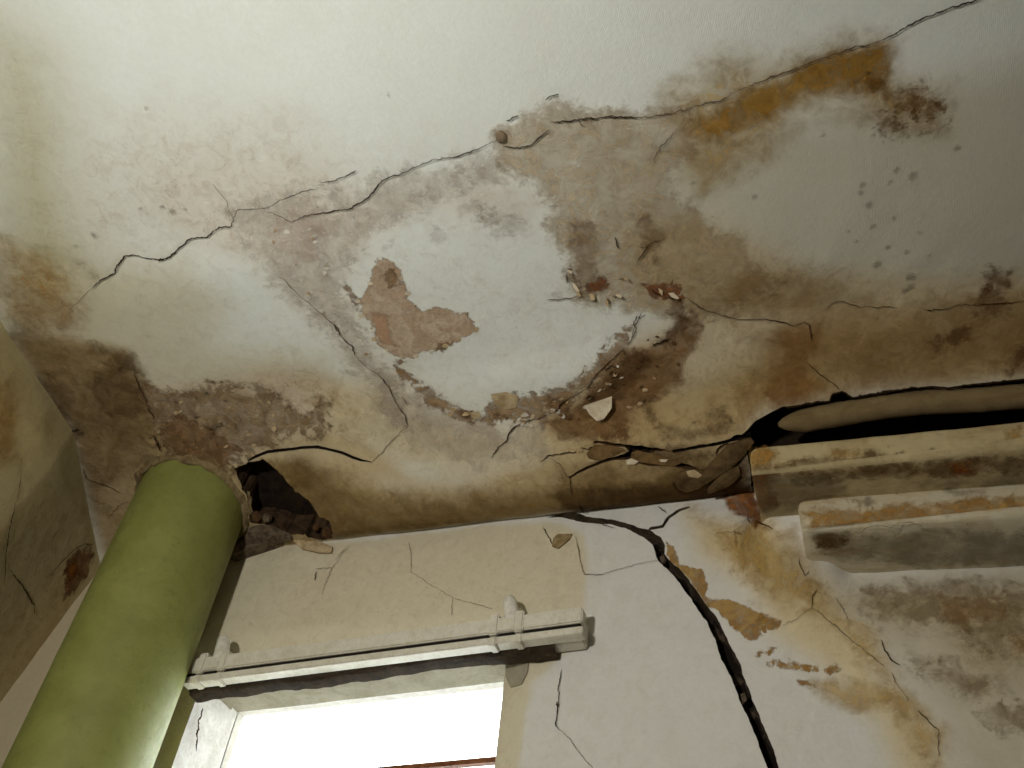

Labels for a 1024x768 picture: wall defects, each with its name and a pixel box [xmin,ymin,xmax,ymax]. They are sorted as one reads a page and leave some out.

crack [70,0,977,309]
rust [682,44,946,184]
damp [140,379,334,475]
flaking render [218,431,333,562]
crack [248,274,408,463]
peeling [299,258,479,372]
damp [393,110,754,441]
peeling [512,351,643,428]
flaking render [539,430,754,513]
damp [282,447,1024,537]
damp [802,497,1024,549]
crack [543,506,779,768]